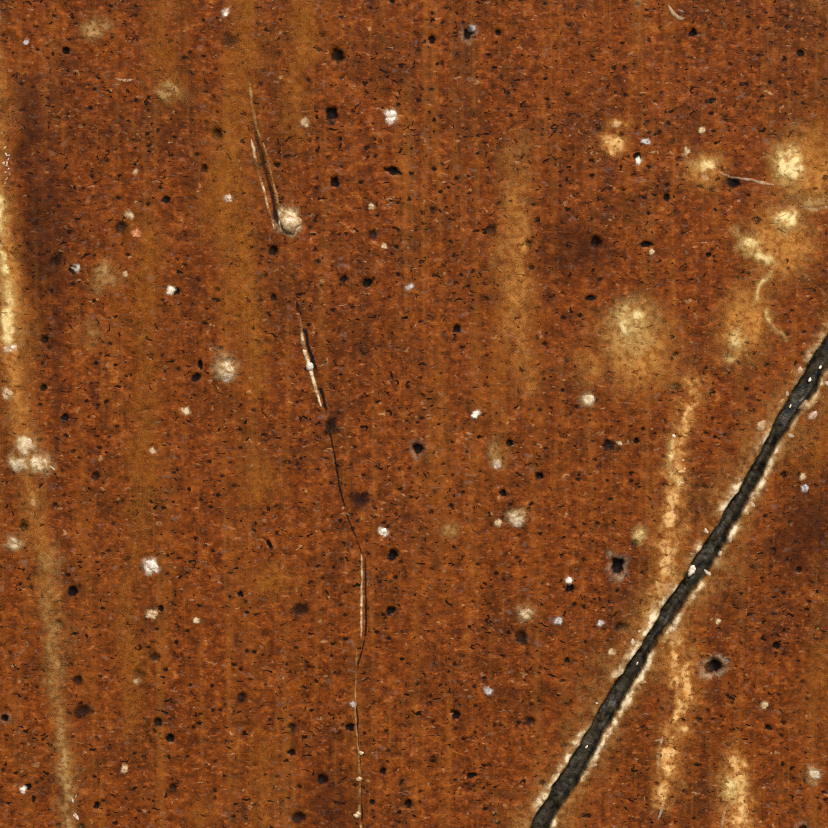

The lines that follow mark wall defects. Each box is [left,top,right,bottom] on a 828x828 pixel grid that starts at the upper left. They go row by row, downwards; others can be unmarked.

crack [249,83,279,227]
leakage [603,135,624,155]
leakage [692,160,715,182]
leakage [776,135,828,207]
leakage [743,211,807,273]
leakage [0,196,26,412]
leakage [615,307,663,378]
leakage [722,279,770,352]
leakage [9,436,55,471]
crack [301,329,367,828]
crack [521,332,828,828]
leakage [58,721,79,828]